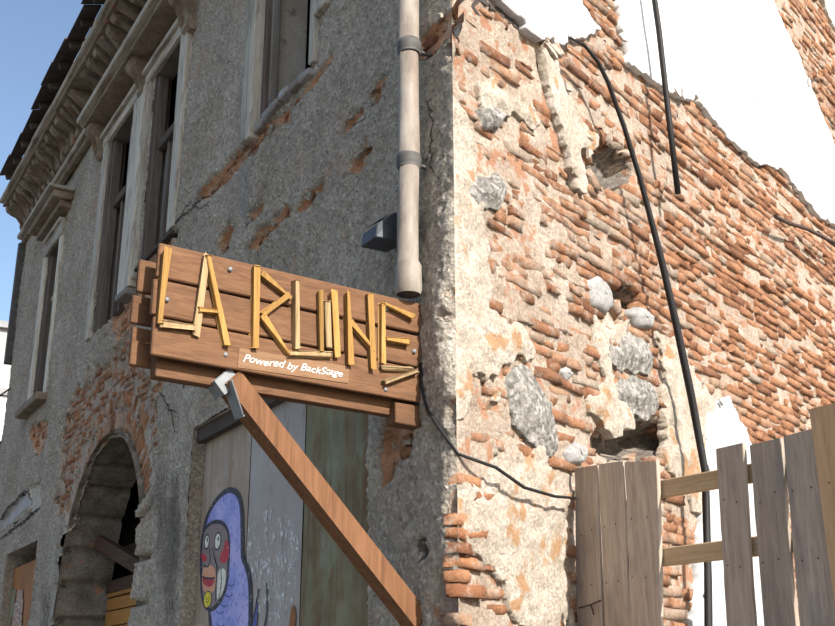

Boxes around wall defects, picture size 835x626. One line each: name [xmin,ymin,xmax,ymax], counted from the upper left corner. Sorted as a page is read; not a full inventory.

flaking render [420,0,464,64]
peeling [491,0,631,196]
peeling [614,0,835,228]
crack [159,193,214,241]
spalling [609,270,634,320]
spalling [590,421,659,462]
peeling [705,396,752,471]
flaking render [431,472,505,626]
peeling [694,489,722,544]
peeling [748,483,757,537]
peeling [686,560,727,626]
peeling [753,556,764,626]